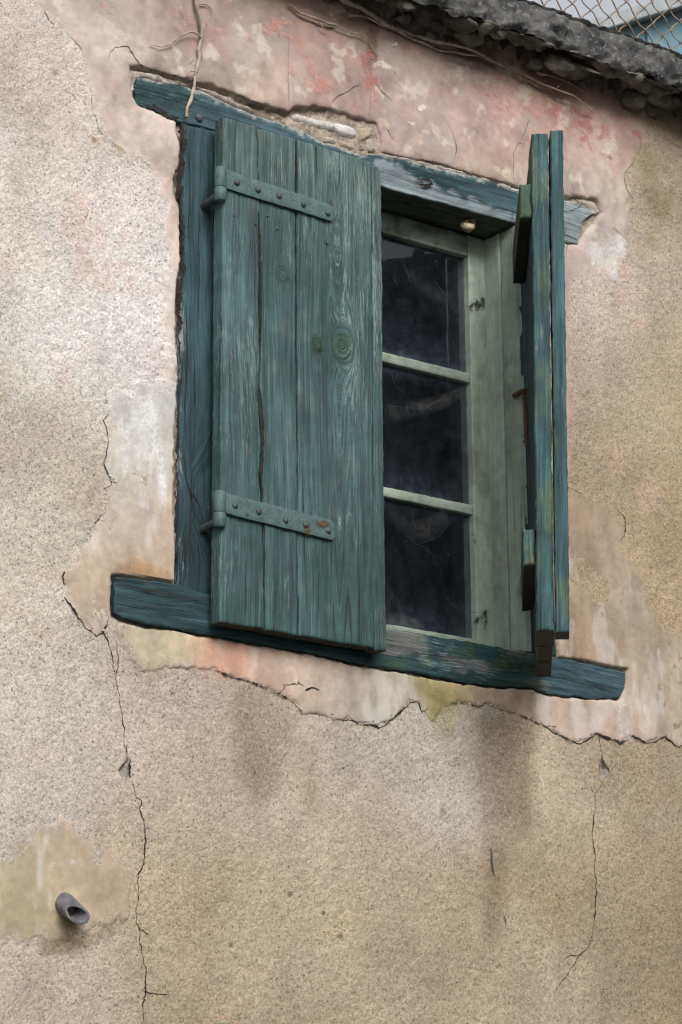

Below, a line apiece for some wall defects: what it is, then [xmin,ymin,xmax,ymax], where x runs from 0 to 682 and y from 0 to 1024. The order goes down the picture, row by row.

flaking render [268,112,377,153]
spalling [353,0,682,123]
peeling [524,87,641,159]
crack [103,413,112,488]
peeling [59,377,682,746]
crack [62,571,127,752]
crack [555,786,600,992]